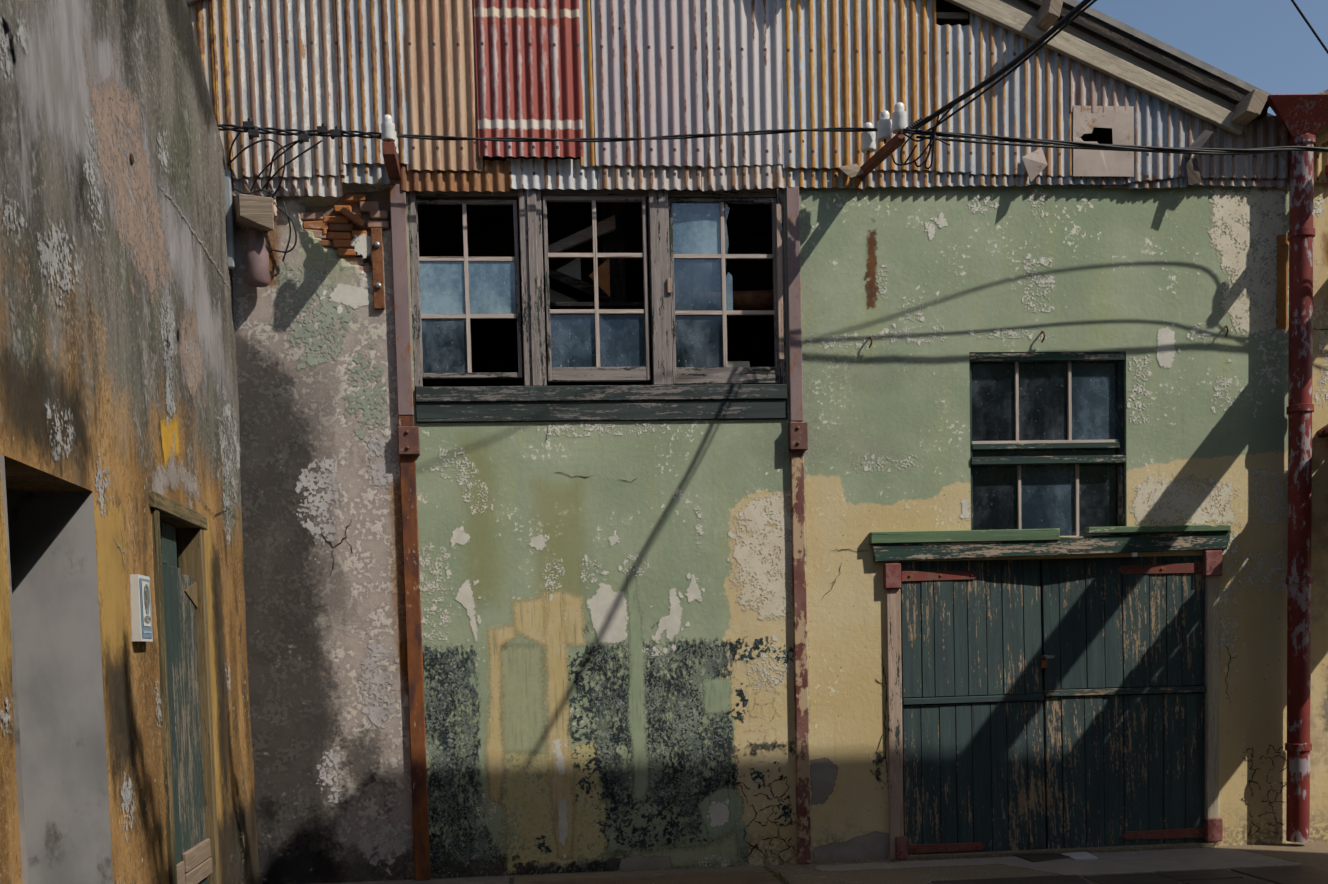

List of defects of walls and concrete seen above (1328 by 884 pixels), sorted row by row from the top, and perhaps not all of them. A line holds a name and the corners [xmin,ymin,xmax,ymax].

leakage [0,0,410,884]
peeling [295,456,343,564]
flaking render [270,187,399,489]
corrosion [864,230,879,308]
peeling [960,498,970,520]
peeling [1127,319,1209,424]
peeling [1207,185,1289,393]
peeling [316,748,341,803]
peeling [419,444,506,870]
leakage [430,854,774,884]
peeling [525,488,795,867]
crack [735,668,797,865]